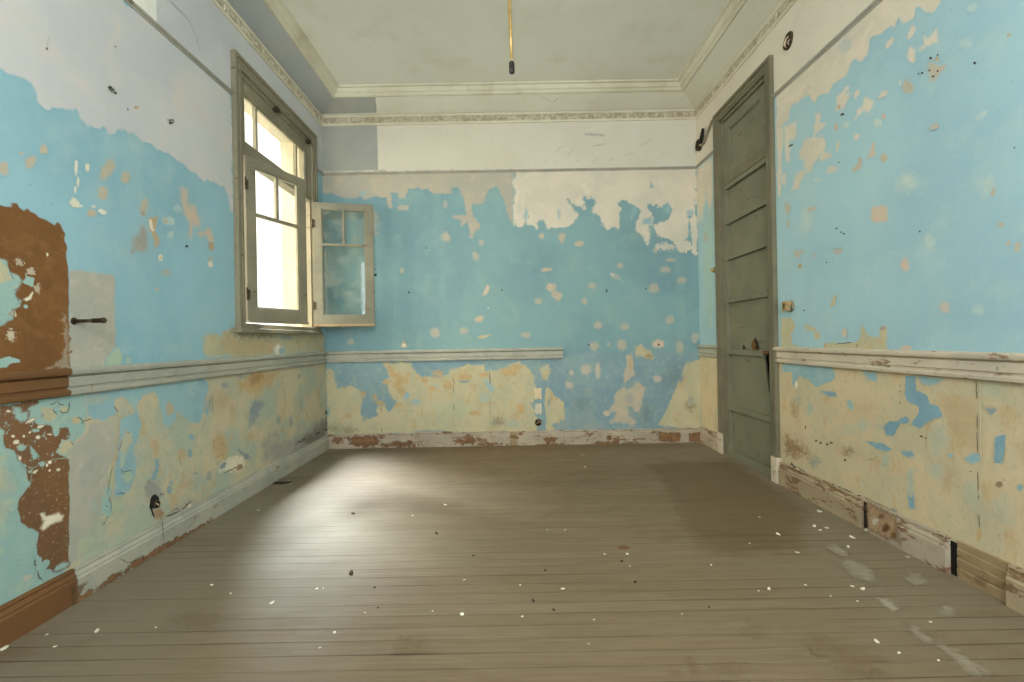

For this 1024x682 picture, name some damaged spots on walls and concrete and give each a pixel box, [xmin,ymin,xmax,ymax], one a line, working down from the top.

peeling [0,0,233,218]
peeling [776,0,950,229]
peeling [129,184,215,291]
peeling [193,156,715,482]
peeling [780,316,912,350]
peeling [0,374,244,606]
spalling [867,500,901,542]
peeling [782,363,1023,532]